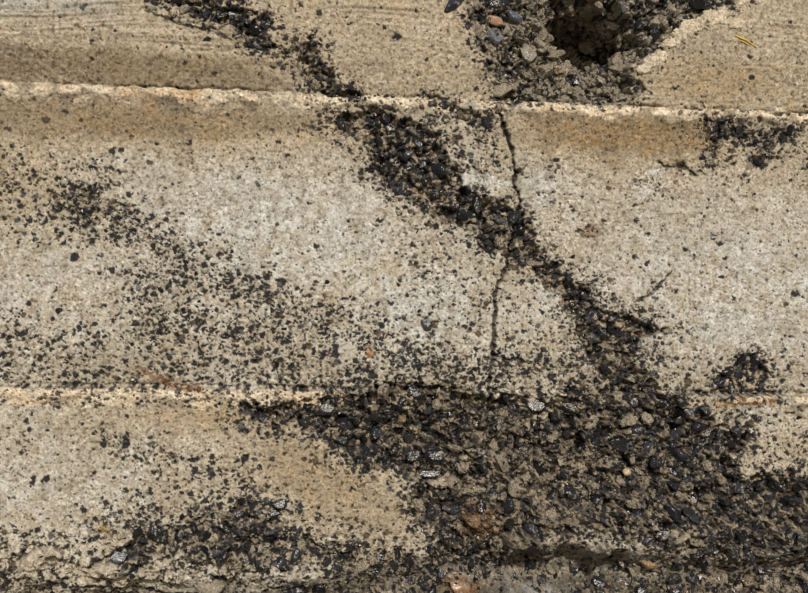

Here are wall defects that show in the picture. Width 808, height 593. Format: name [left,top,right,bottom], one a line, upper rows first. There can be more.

spalling [154,0,366,112]
spalling [423,0,750,133]
spalling [51,182,121,226]
crack [485,113,527,423]
spalling [238,105,808,593]
spalling [115,494,462,593]